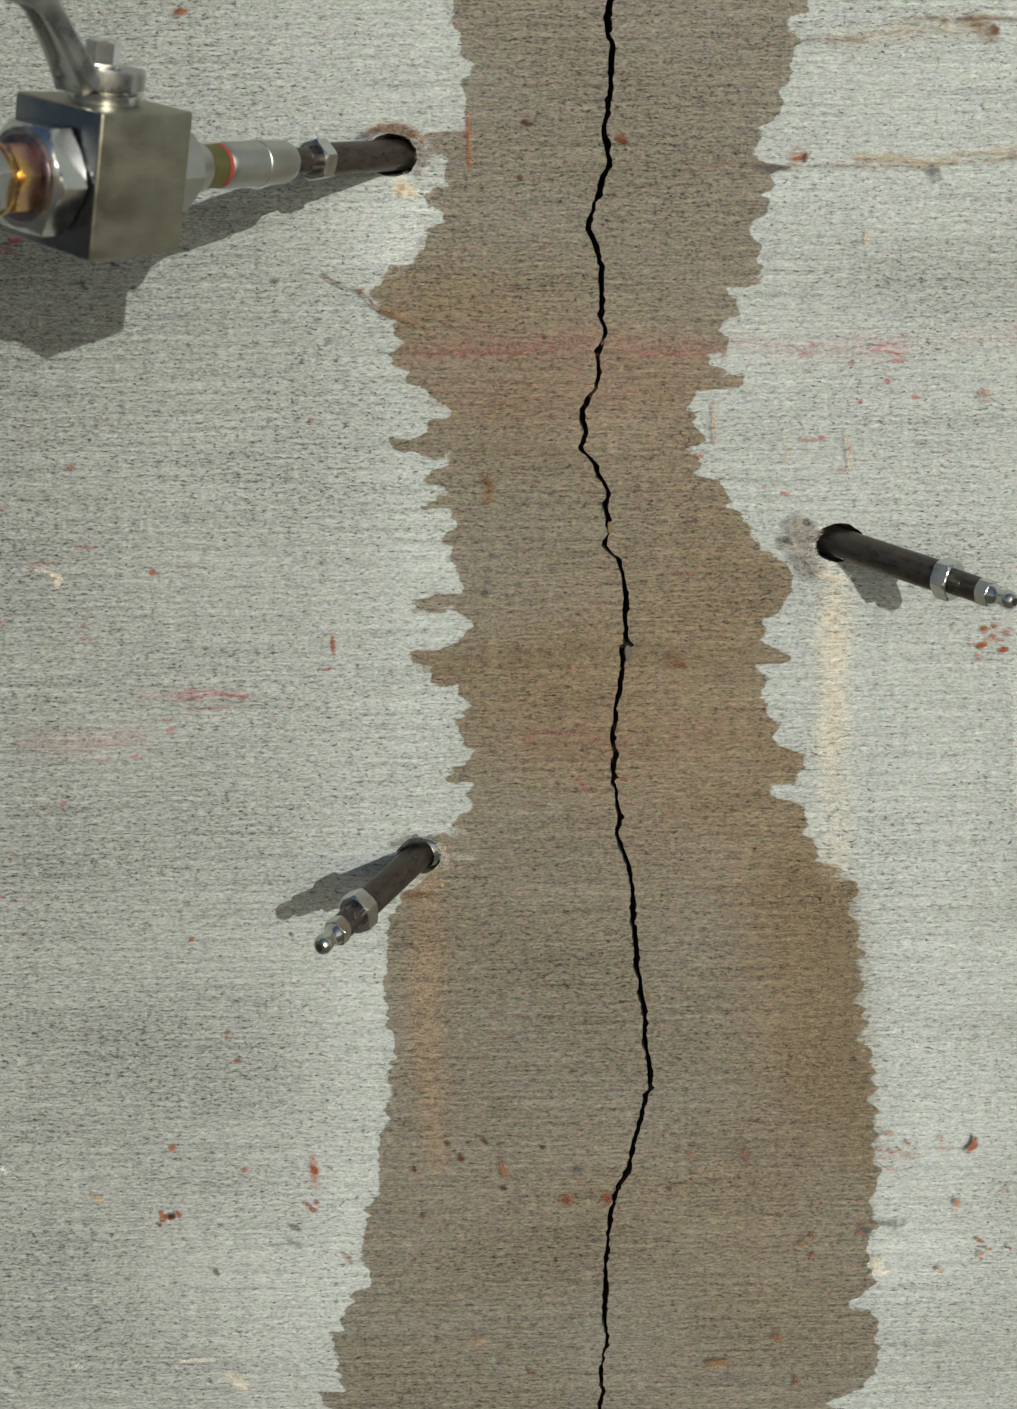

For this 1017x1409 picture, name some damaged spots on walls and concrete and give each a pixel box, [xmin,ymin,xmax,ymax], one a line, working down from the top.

water stain [319,0,899,1409]
crack [578,0,655,1409]
corrosion [978,625,1009,653]